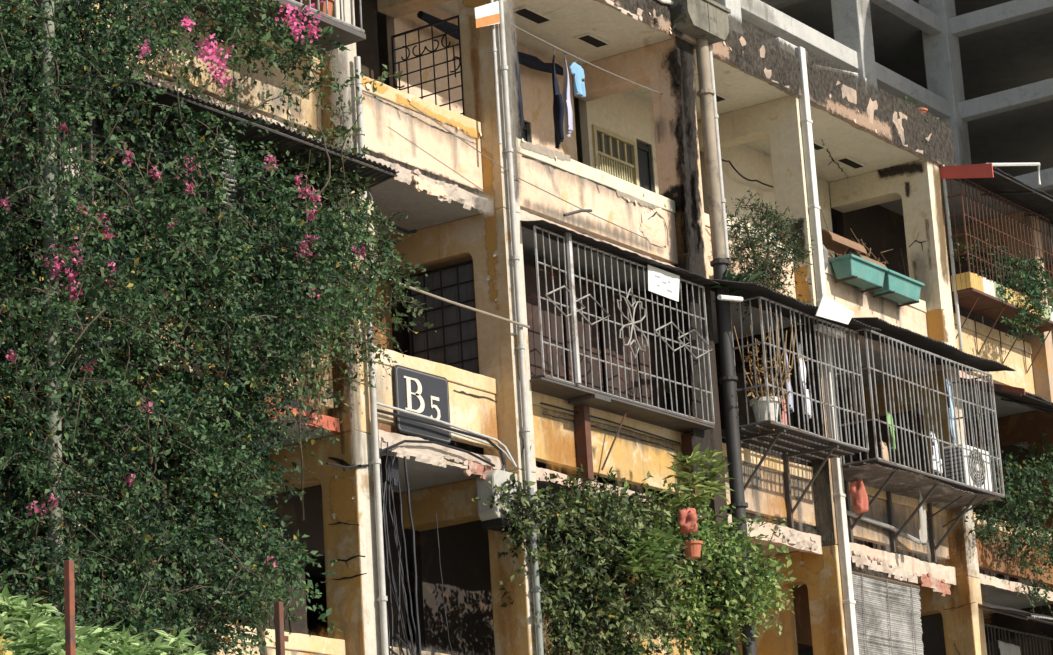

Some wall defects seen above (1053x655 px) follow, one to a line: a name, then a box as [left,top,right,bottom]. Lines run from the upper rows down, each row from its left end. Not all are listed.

spalling [603,0,672,34]
peeling [709,42,731,58]
peeling [827,100,892,139]
peeling [361,76,499,309]
water stain [610,0,714,477]
water stain [590,421,673,449]
spalling [379,437,493,481]
spalling [852,550,951,596]